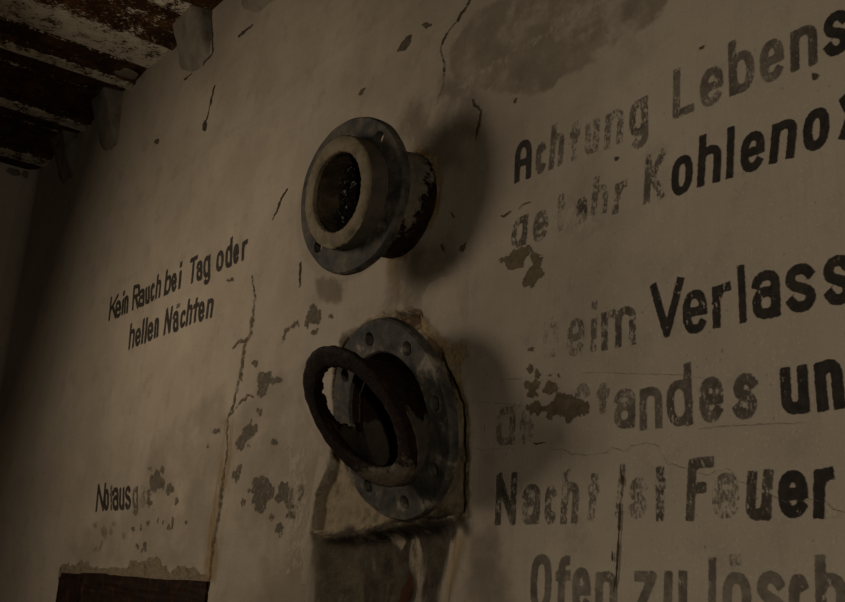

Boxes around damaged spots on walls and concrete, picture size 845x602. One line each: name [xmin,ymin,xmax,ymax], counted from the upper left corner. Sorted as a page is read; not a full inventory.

crack [436,0,470,104]
crack [472,99,481,139]
flaking render [499,245,544,288]
flaking render [282,303,333,340]
crack [209,275,256,581]
flaking render [235,408,262,451]
flaking render [251,360,282,397]
peeling [310,306,470,538]
flaking render [524,364,589,423]
flaking render [241,475,304,537]